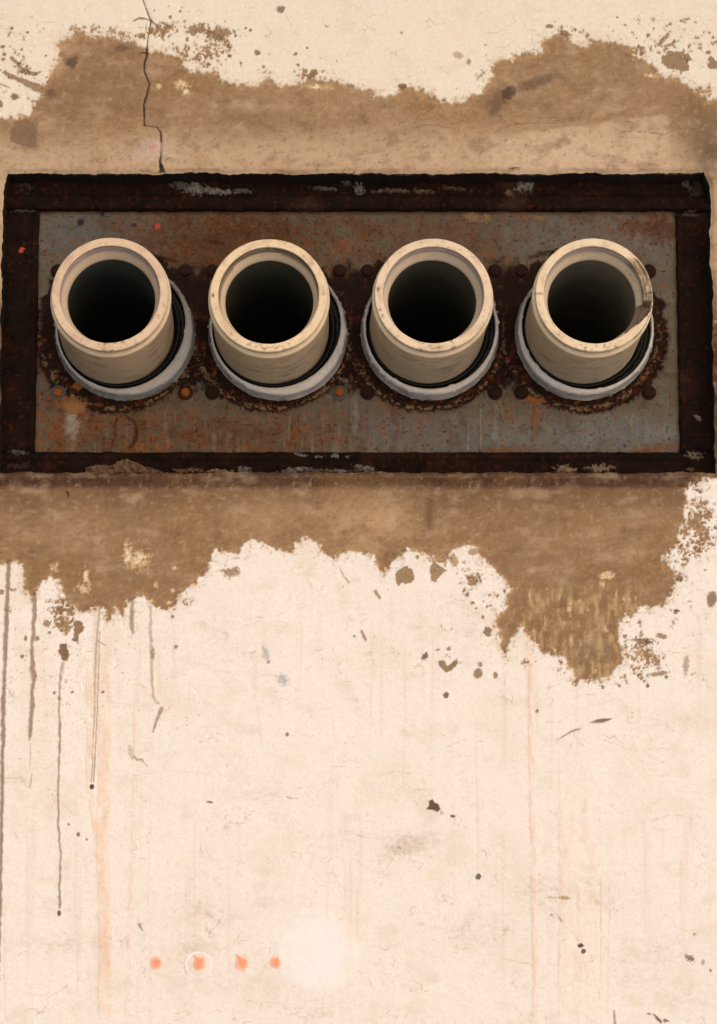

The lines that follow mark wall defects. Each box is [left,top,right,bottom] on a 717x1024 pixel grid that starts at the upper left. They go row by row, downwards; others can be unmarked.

damp [9,116,39,149]
damp [63,53,81,72]
damp [112,43,132,54]
crack [132,0,171,174]
damp [481,68,575,126]
corrosion [37,211,680,453]
damp [0,558,13,983]
damp [27,591,38,789]
damp [56,661,67,917]
damp [89,606,106,789]
damp [128,596,165,733]
damp [267,660,291,688]